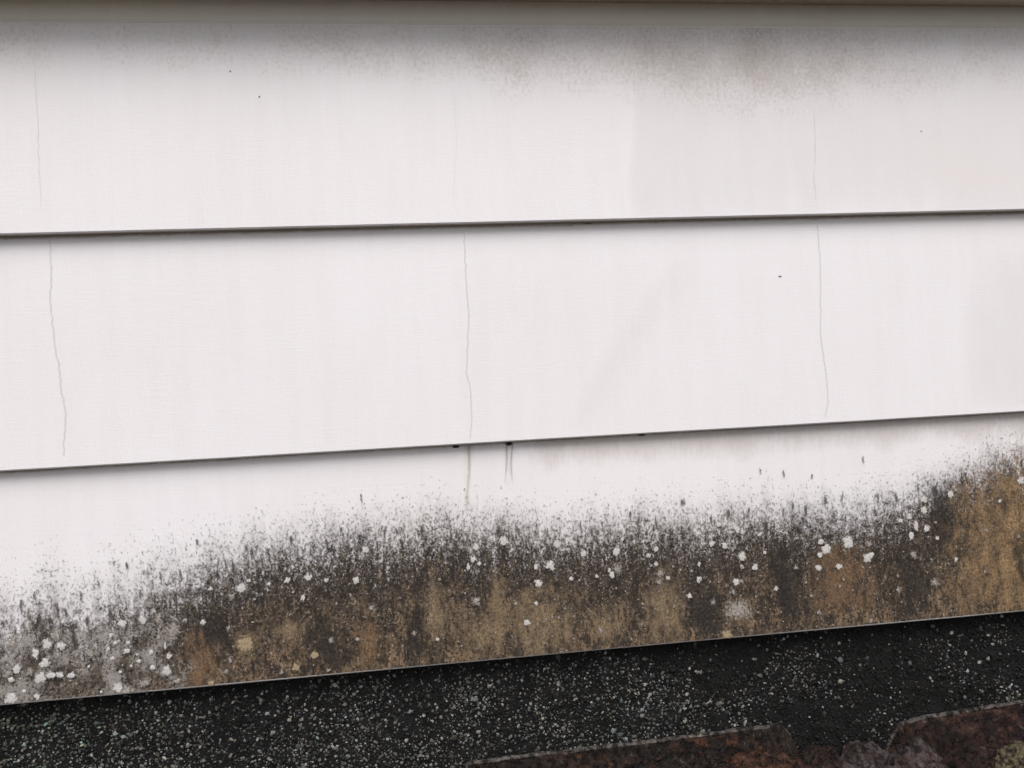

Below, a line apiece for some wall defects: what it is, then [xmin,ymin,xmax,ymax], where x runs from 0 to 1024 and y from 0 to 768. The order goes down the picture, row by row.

crack [49,240,67,456]
crack [463,233,473,439]
crack [817,224,829,417]
damp [0,449,1024,704]